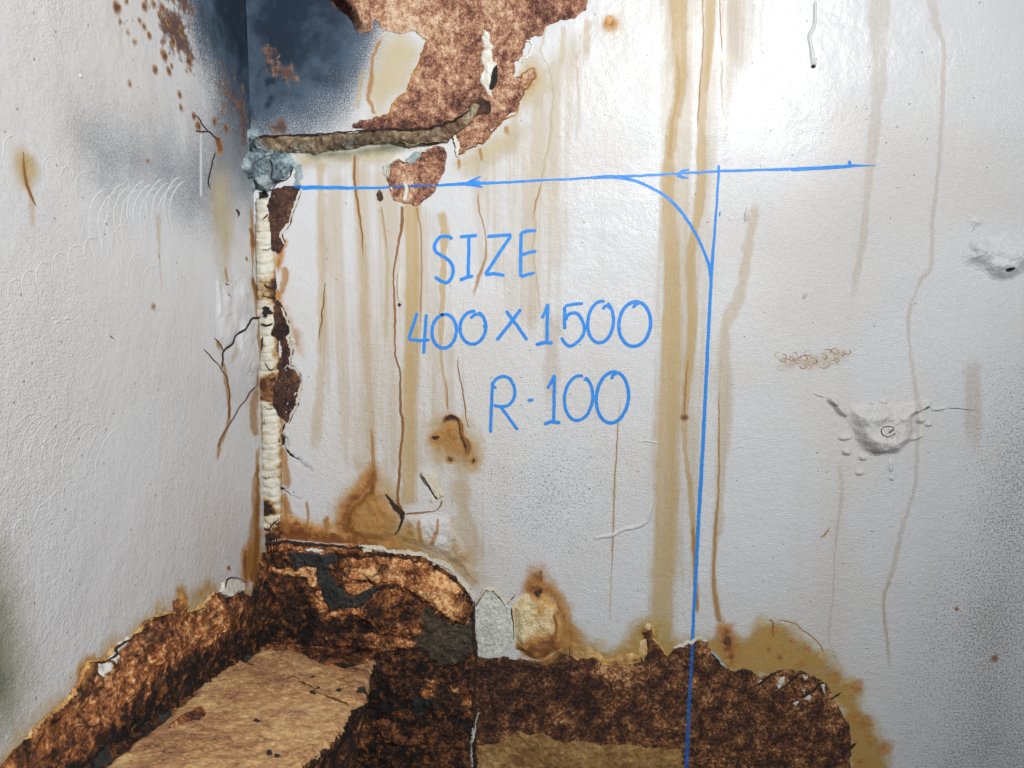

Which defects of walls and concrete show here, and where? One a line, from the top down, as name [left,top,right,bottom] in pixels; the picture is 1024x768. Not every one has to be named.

rust [138,0,195,76]
leakage [366,37,415,113]
rust [352,0,588,157]
rust [697,0,722,120]
peeling [247,129,270,159]
leakage [300,142,418,167]
crack [205,284,277,457]
rust [0,126,858,768]
peeling [219,566,246,598]
peeling [475,586,516,657]
leakage [591,622,689,667]
leakage [708,619,889,768]